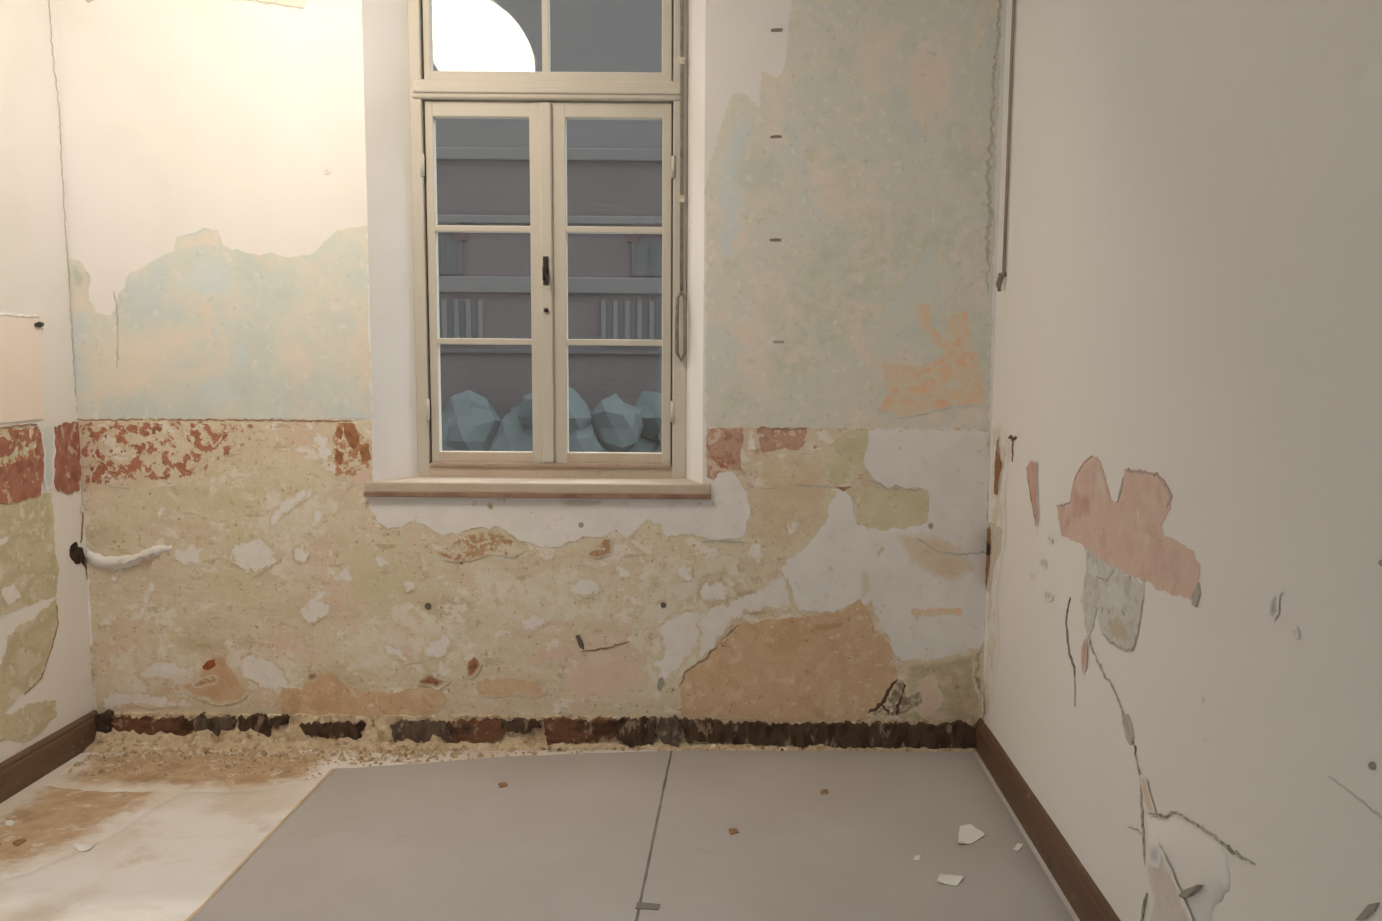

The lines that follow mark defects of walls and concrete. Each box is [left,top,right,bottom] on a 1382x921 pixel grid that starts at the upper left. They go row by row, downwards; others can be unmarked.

peeling [0,0,1003,743]
spalling [1056,455,1201,652]
crack [1065,597,1255,921]